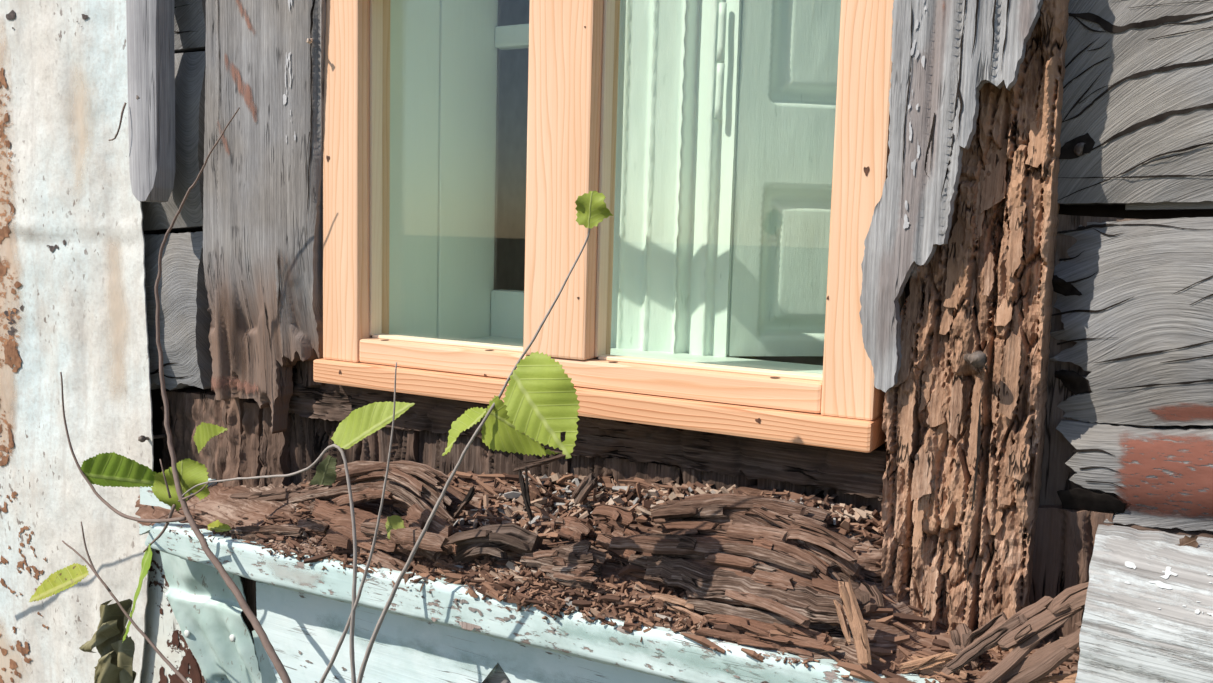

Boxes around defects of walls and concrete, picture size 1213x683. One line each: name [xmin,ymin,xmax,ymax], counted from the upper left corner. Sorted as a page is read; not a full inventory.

crack [1062,0,1213,123]
crack [1057,103,1213,201]
corrosion [0,45,22,466]
spalling [881,0,1070,636]
crack [1051,224,1213,403]
crack [1072,449,1126,490]
corrosion [0,626,31,683]
peeling [158,630,201,683]
peeling [414,588,491,631]
peeling [1149,566,1178,589]